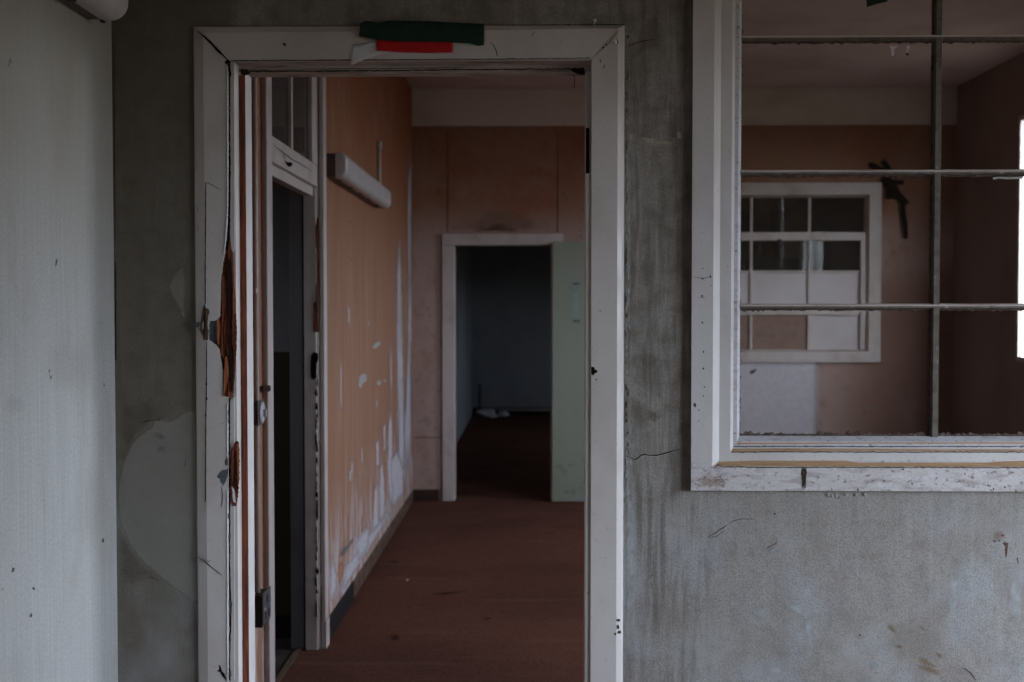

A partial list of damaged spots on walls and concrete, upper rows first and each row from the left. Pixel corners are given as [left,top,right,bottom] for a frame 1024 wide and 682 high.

peeling [331,171,411,599]
crack [626,447,680,461]